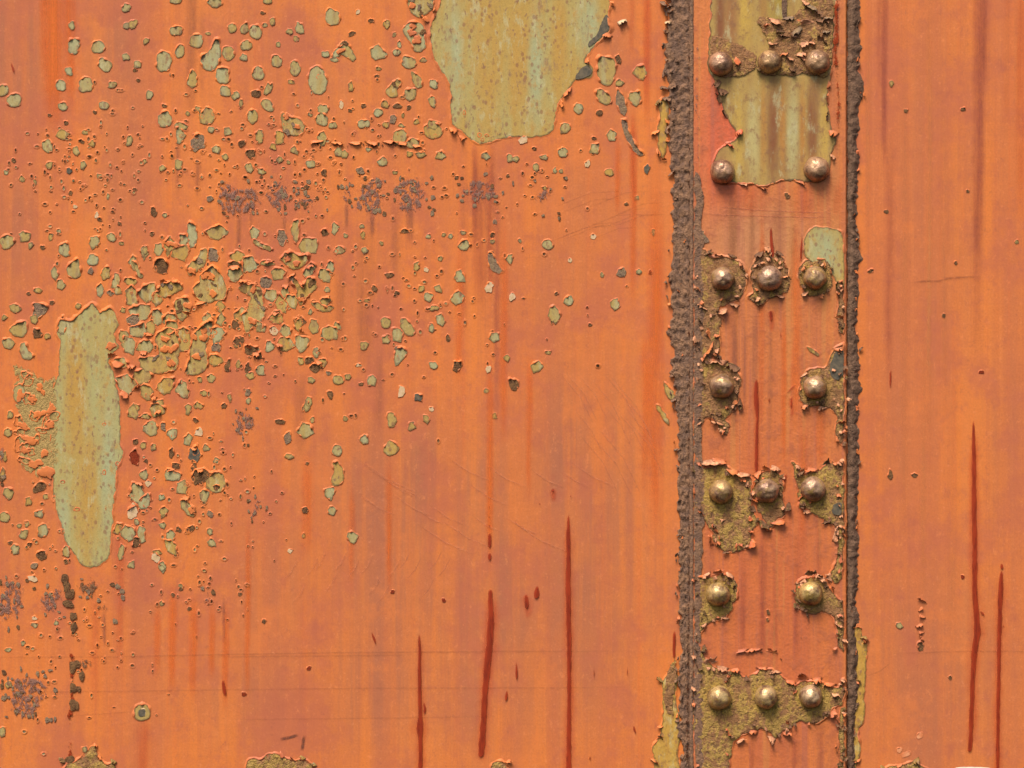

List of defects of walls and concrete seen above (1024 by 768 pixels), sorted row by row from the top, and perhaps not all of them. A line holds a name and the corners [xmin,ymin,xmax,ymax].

peeling [0,83,22,108]
peeling [41,0,679,179]
peeling [706,0,841,199]
peeling [150,206,169,218]
peeling [0,211,472,583]
peeling [748,465,791,531]
corrosion [417,636,426,768]
corrosion [478,590,494,757]
corrosion [663,632,678,715]
corrosion [968,422,984,752]
corrosion [996,564,1004,768]